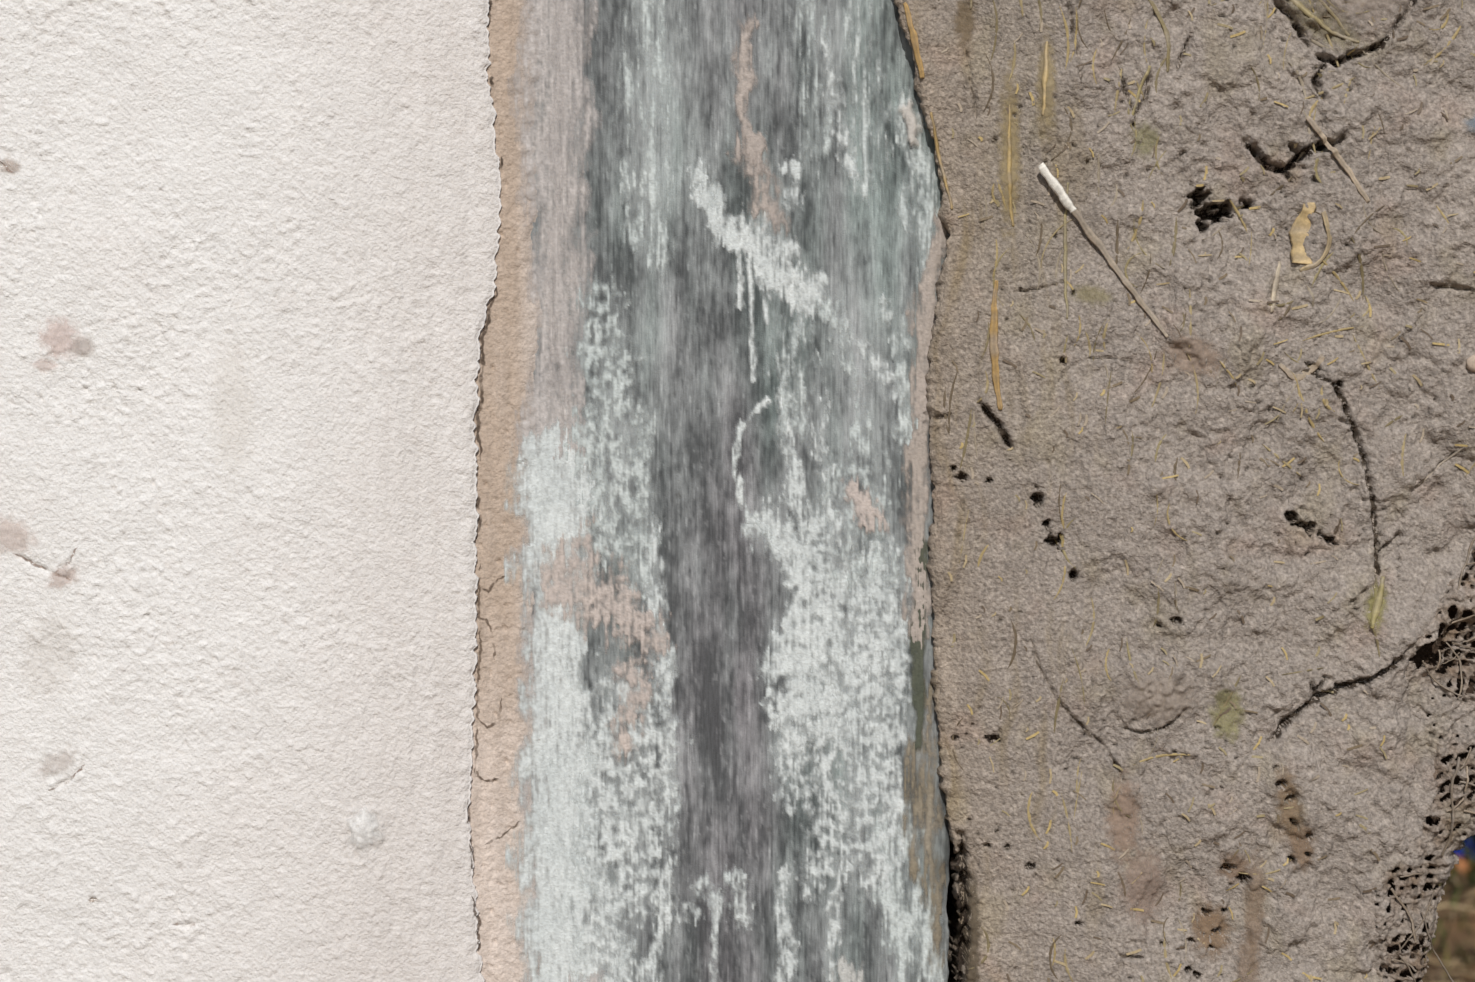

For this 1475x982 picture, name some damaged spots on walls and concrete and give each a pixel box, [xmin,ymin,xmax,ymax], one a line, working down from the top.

crack [1277,0,1417,96]
peeling [727,16,788,232]
peeling [899,101,921,145]
crack [1245,142,1334,182]
peeling [845,214,947,650]
crack [1311,373,1395,605]
peeling [540,516,670,759]
crack [1269,655,1405,741]
crack [956,834,970,982]